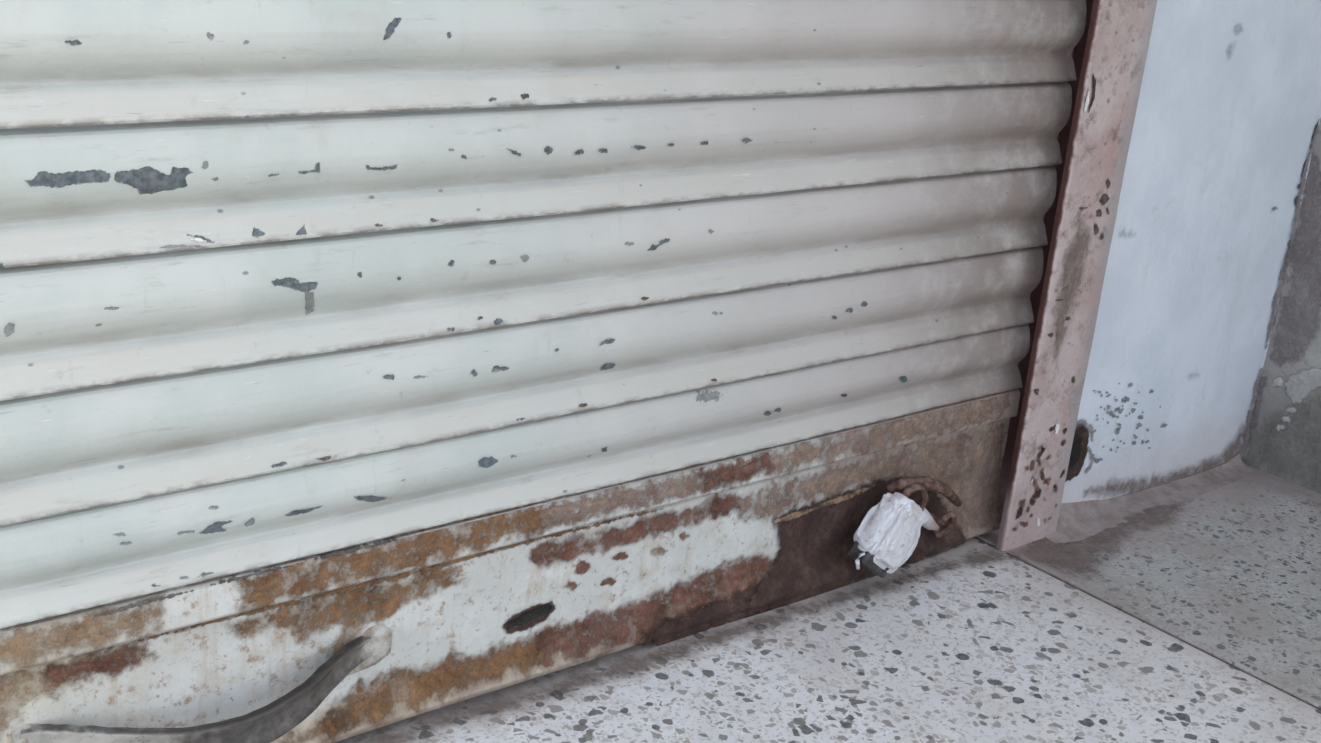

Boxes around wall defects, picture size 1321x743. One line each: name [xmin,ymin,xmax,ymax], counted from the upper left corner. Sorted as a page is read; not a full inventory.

peeling [26,161,218,195]
crack [1272,120,1320,279]
spalling [1065,420,1095,482]
corrosion [0,393,1067,743]
peeling [503,601,556,634]